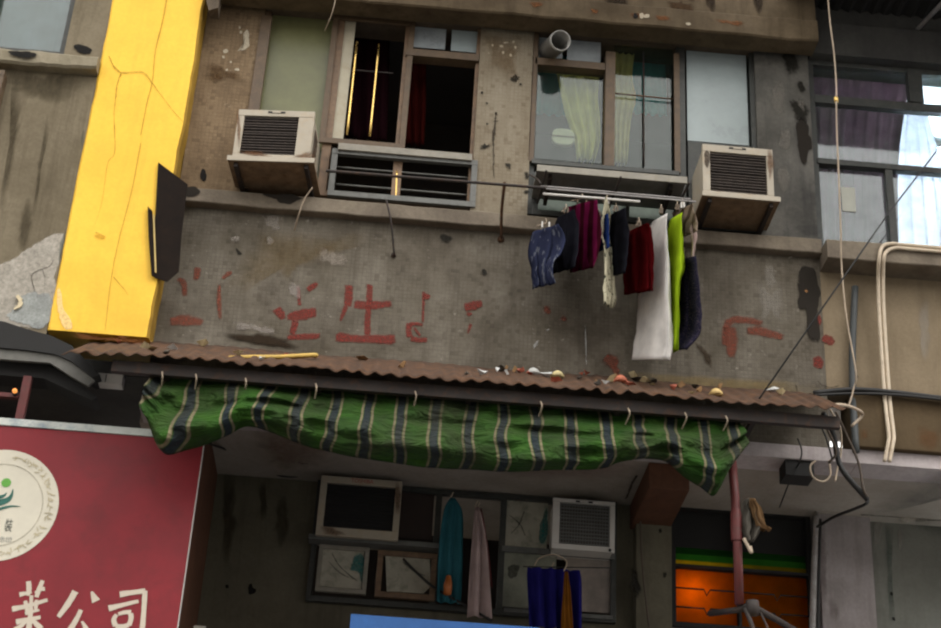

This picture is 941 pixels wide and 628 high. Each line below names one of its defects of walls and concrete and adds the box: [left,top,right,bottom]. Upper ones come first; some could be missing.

water stain [782,53,809,121]
crack [95,0,179,329]
peeling [0,234,137,343]